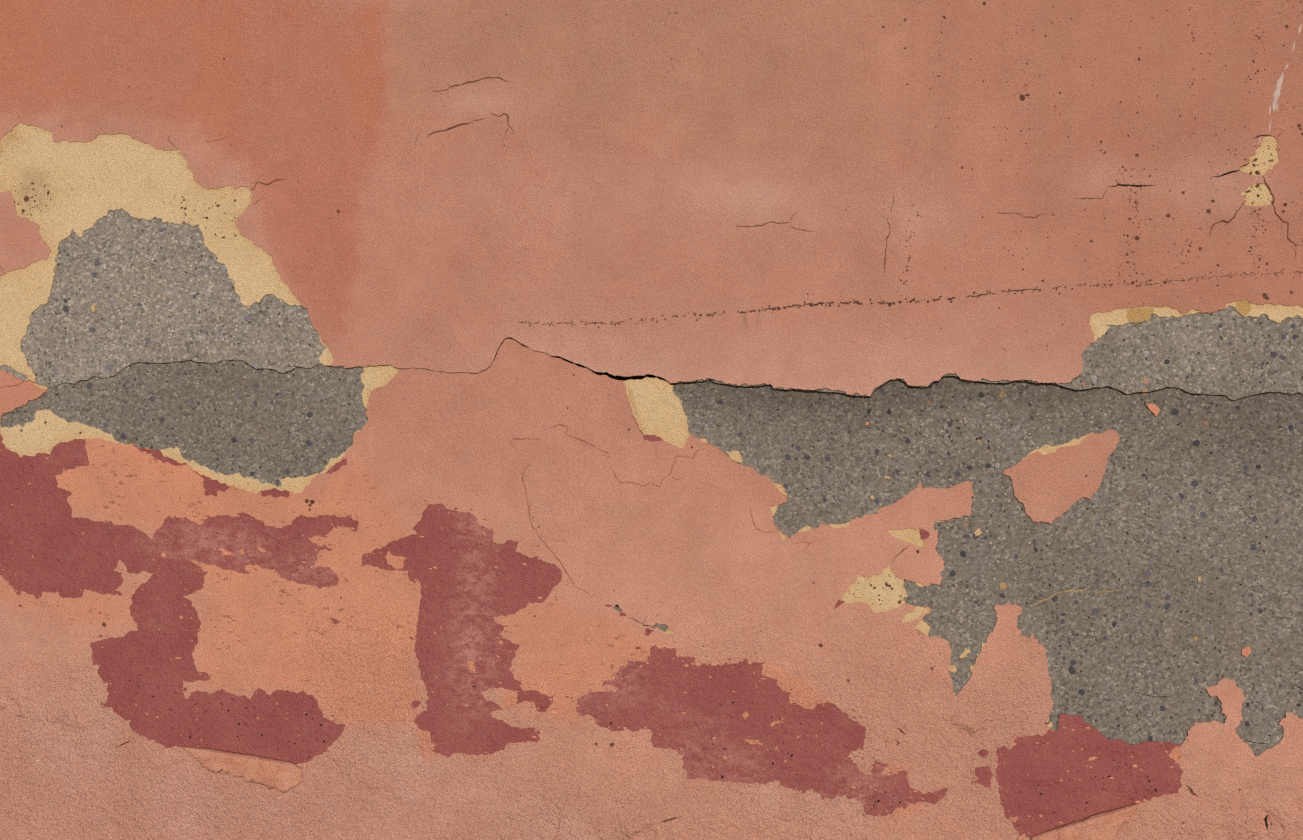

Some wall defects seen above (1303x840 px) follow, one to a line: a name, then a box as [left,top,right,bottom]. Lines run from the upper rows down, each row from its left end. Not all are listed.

crack [415,112,513,146]
crack [441,72,505,91]
crack [884,197,894,276]
crack [1210,135,1298,259]
crack [0,337,1303,401]
spalling [0,123,573,793]
crack [509,424,703,597]
spalling [571,299,1303,840]